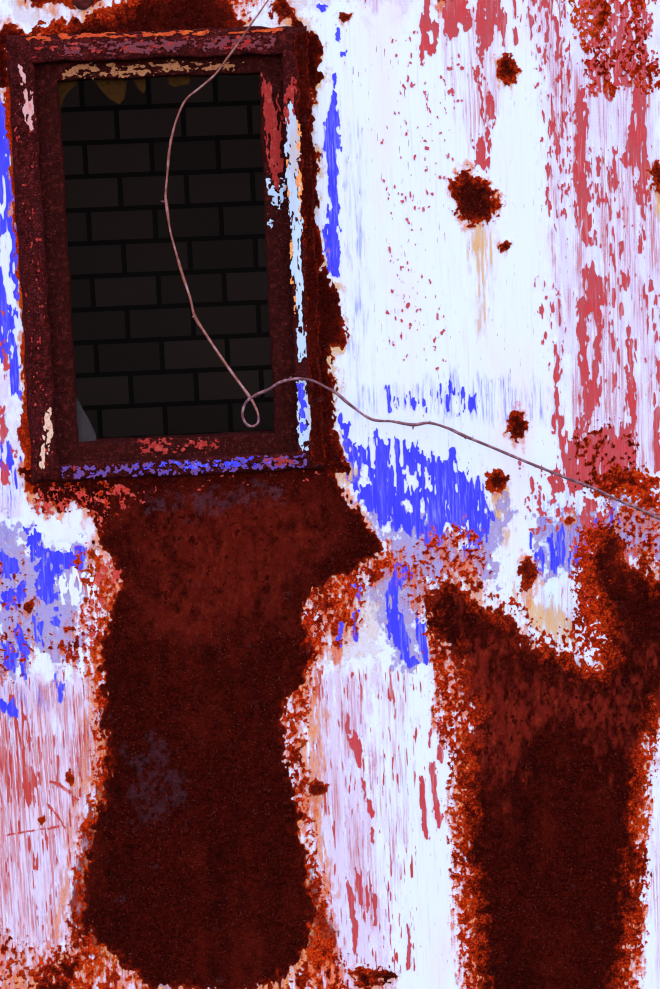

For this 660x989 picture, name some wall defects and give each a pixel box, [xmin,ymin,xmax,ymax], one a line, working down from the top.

peeling [25,27,283,79]
corrosion [568,0,660,100]
peeling [0,64,45,506]
corrosion [0,0,262,321]
peeling [261,72,307,362]
corrosion [446,160,512,328]
peeling [0,372,319,680]
peeling [336,412,495,560]
corrosion [503,407,529,447]
corrosion [57,626,84,673]
peeling [385,562,429,669]
corrosion [347,966,398,989]